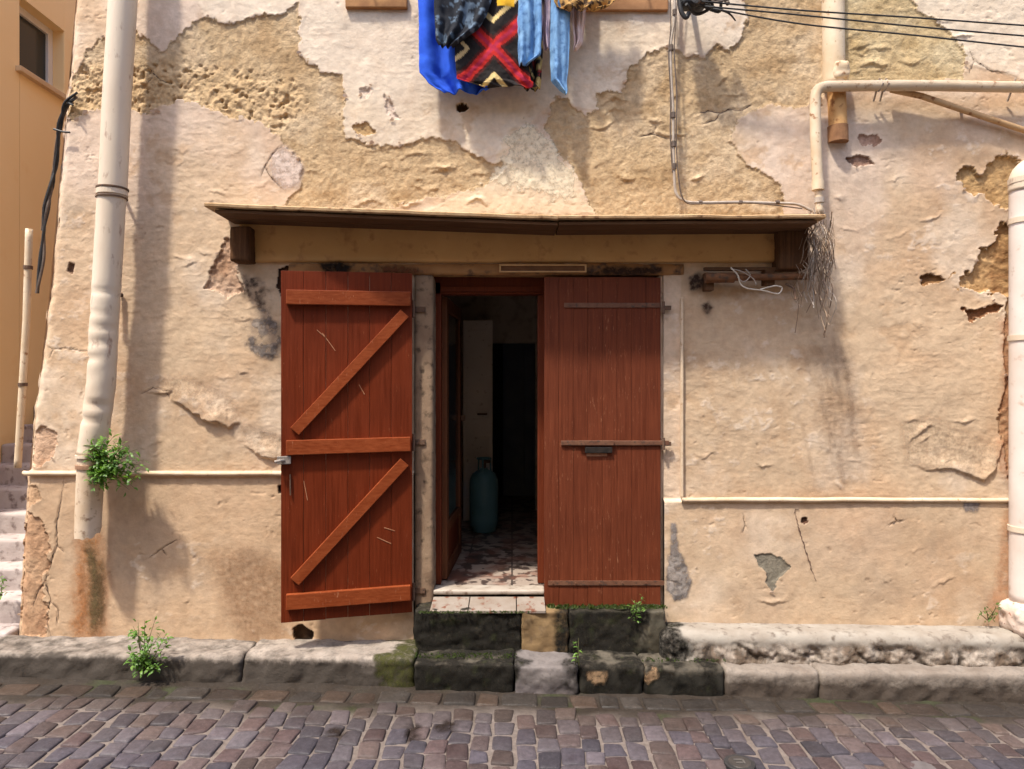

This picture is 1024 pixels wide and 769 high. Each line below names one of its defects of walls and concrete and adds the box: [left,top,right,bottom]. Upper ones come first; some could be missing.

flaking render [66,35,105,121]
flaking render [131,0,824,215]
flaking render [846,134,881,167]
flaking render [956,149,1019,209]
flaking render [204,238,244,299]
damp [243,278,281,360]
flaking render [920,274,943,286]
flaking render [959,222,1008,478]
flaking render [32,424,58,467]
flaking render [17,485,52,636]
crack [33,480,64,635]
peeling [755,554,791,594]